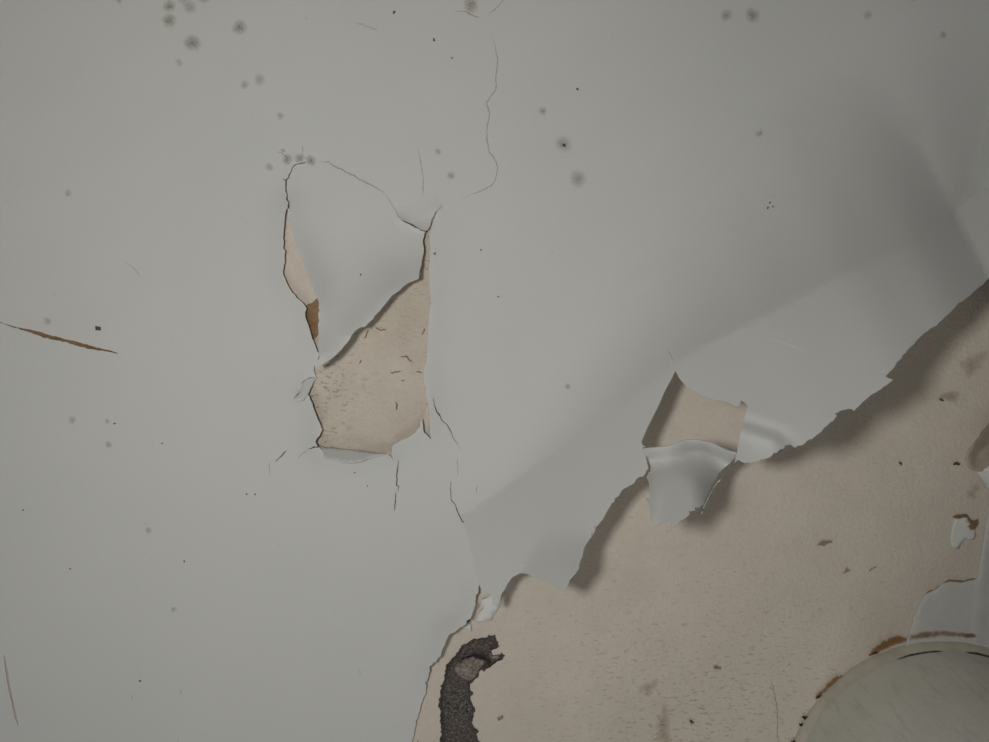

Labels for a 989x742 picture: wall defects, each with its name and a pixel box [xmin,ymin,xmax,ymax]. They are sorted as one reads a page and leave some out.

crack [283,162,305,209]
crack [0,322,116,353]
flaking render [283,209,431,463]
flaking render [412,279,989,742]